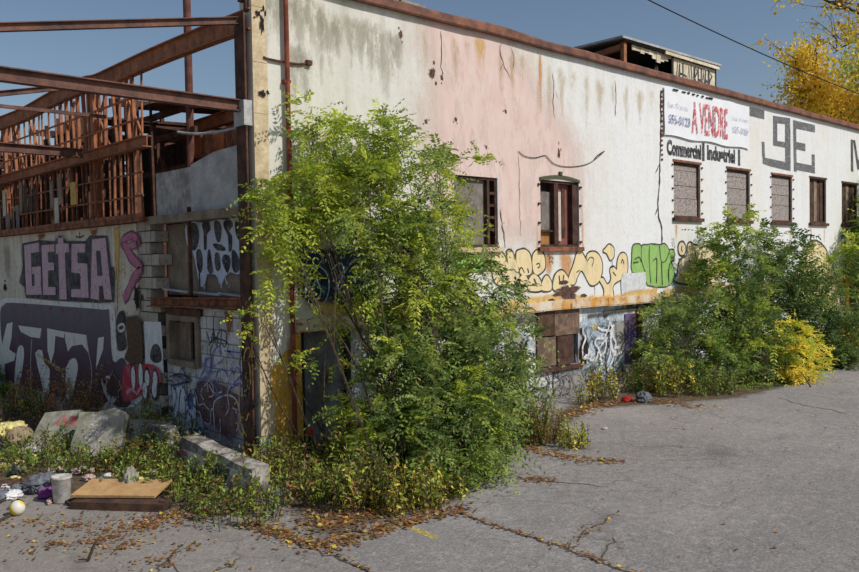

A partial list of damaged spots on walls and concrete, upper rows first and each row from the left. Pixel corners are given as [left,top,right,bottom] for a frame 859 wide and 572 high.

spalling [254,5,266,36]
crack [655,90,664,243]
corrosion [508,295,563,304]
corrosion [576,287,698,299]